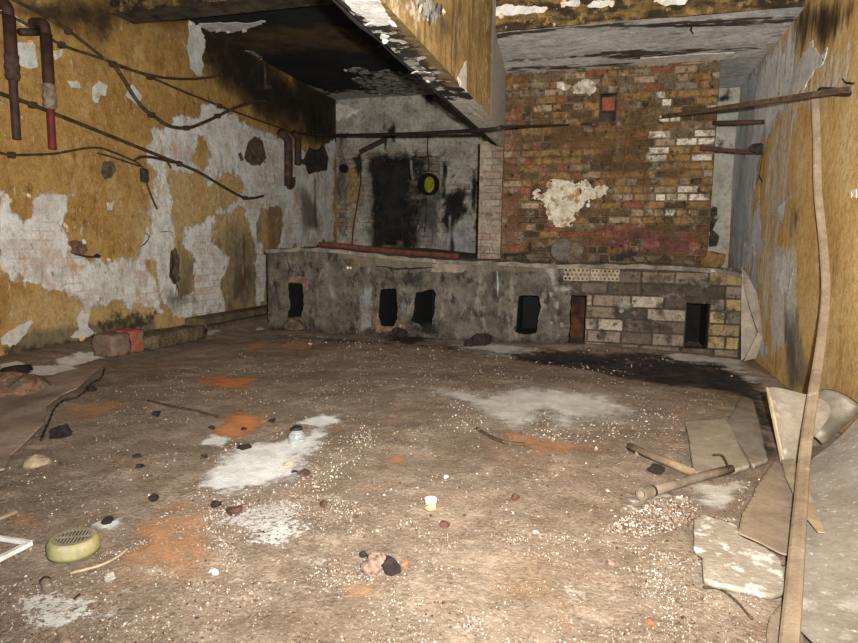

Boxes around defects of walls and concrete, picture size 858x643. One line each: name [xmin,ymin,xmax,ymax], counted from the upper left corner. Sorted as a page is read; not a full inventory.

peeling [345,0,397,44]
peeling [417,0,446,26]
peeling [496,4,548,19]
peeling [561,0,615,8]
peeling [344,57,435,96]
peeling [730,25,828,302]
peeling [0,101,364,341]
water stain [373,181,382,247]
water stain [447,216,476,253]
peeling [531,179,608,228]
peeling [1,320,33,347]